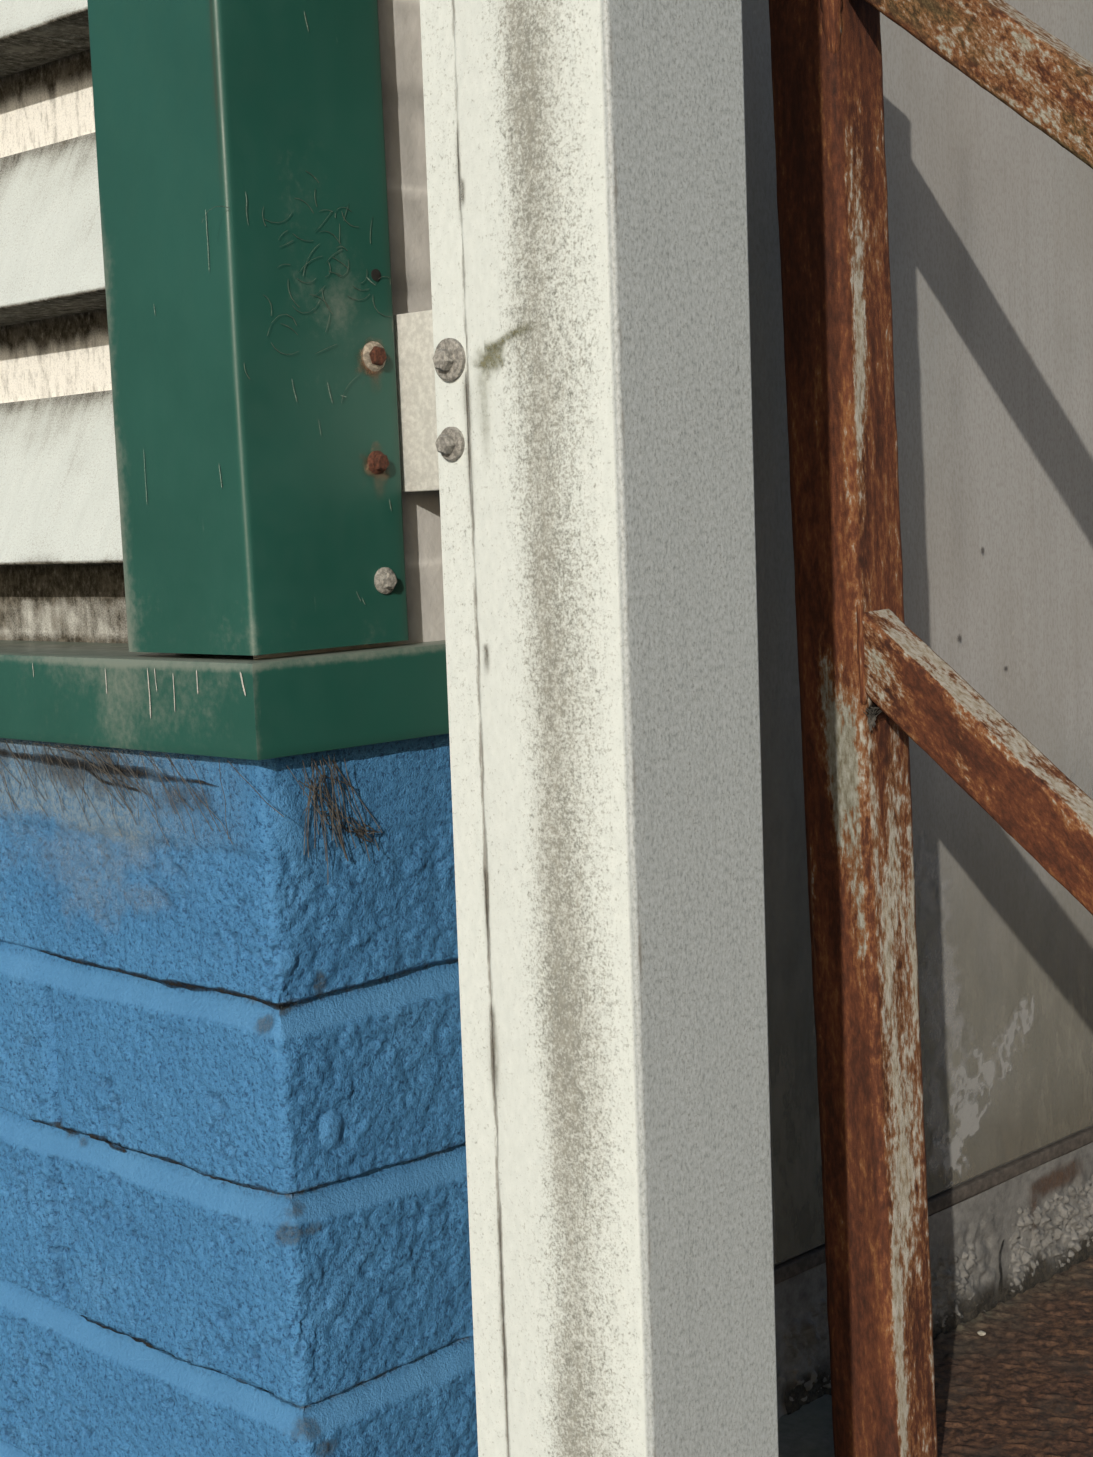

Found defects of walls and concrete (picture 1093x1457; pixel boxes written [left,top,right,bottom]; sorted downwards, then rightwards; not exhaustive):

water stain [0,738,139,841]
water stain [770,960,825,1263]
peeling [937,998,1034,1174]
water stain [918,915,1093,1196]